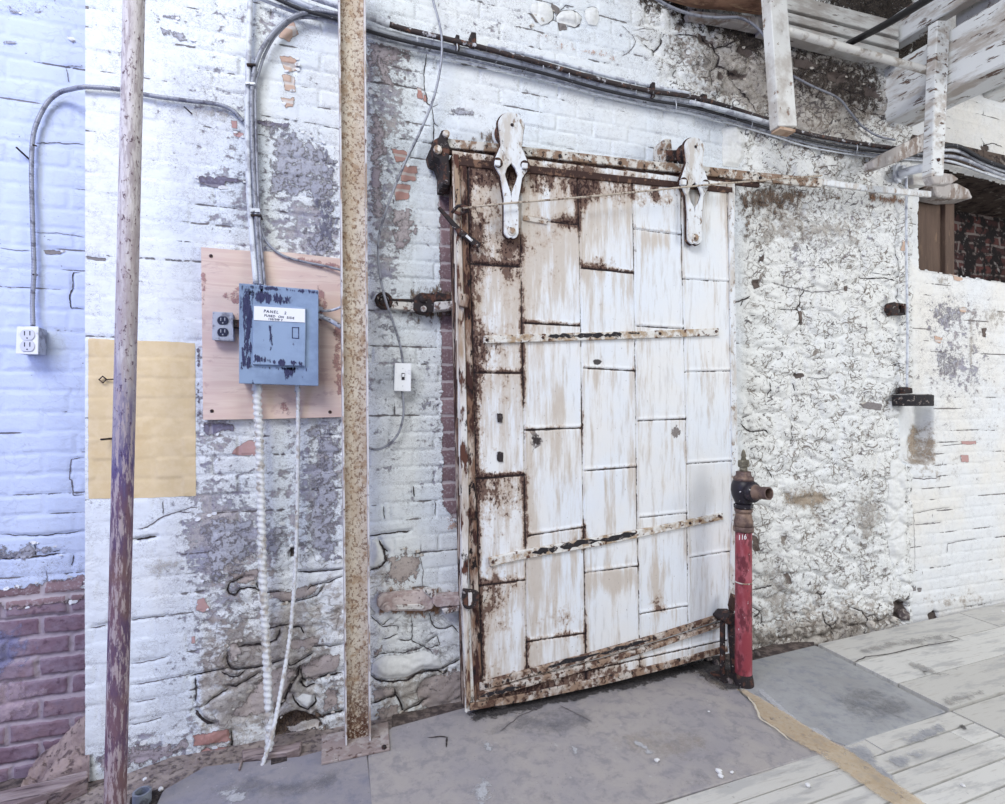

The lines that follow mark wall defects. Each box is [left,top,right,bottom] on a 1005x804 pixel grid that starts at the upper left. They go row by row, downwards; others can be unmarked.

spalling [529,3,567,31]
peeling [257,117,340,257]
crack [772,251,900,333]
peeling [930,300,967,382]
water stain [908,426,936,463]
peeling [194,418,342,612]
spalling [378,547,424,588]
spalling [224,639,243,661]
crack [132,569,343,746]
spalling [231,636,343,735]
spalling [372,684,404,719]
peeling [127,729,231,768]